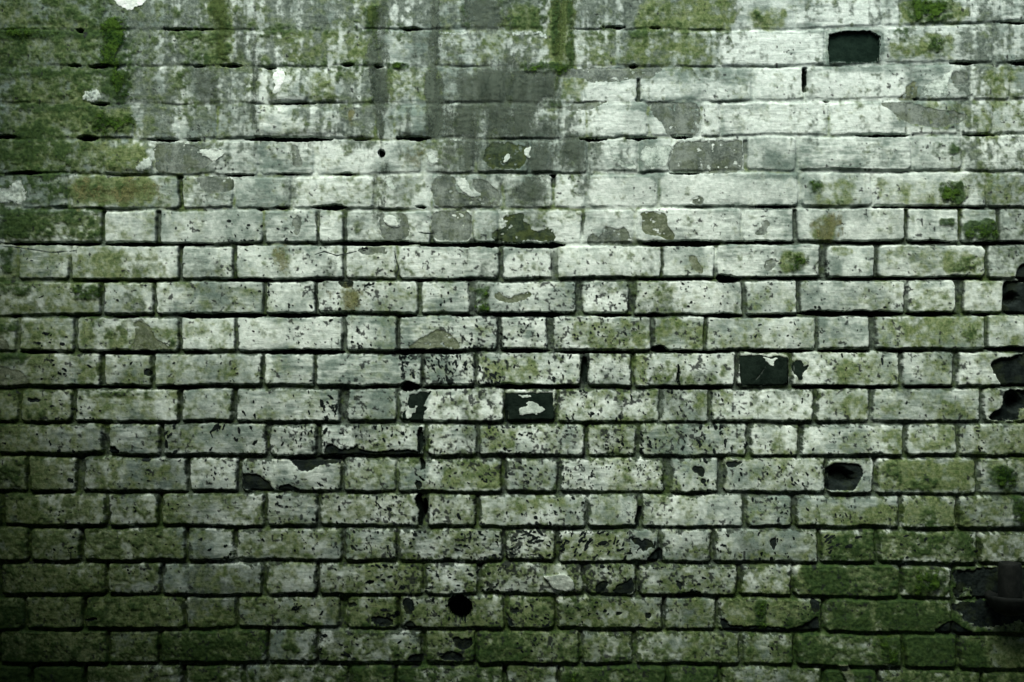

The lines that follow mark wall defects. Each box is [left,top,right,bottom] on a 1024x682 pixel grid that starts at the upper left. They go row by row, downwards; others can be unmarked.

water stain [210,0,232,66]
water stain [248,35,260,127]
water stain [366,1,390,138]
water stain [424,0,585,202]
spalling [227,214,294,332]
peeling [492,213,556,244]
peeling [640,211,675,240]
flaking render [739,323,809,404]
spalling [989,353,1024,421]
spalling [274,282,687,629]
spalling [824,452,863,491]
spalling [935,535,1024,637]